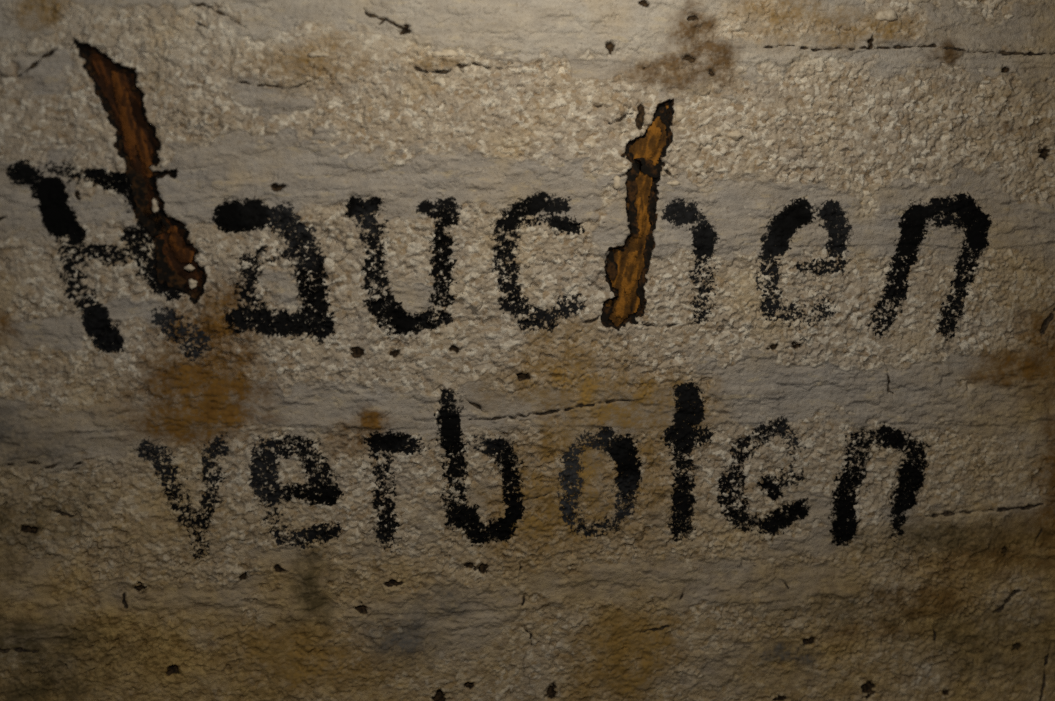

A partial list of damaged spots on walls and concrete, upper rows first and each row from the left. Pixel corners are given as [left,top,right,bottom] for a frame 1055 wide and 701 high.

spalling [0,1,648,200]
spalling [643,37,1055,202]
crack [763,44,1055,56]
spalling [0,227,83,410]
spalling [194,201,1055,400]
spalling [0,406,1055,701]